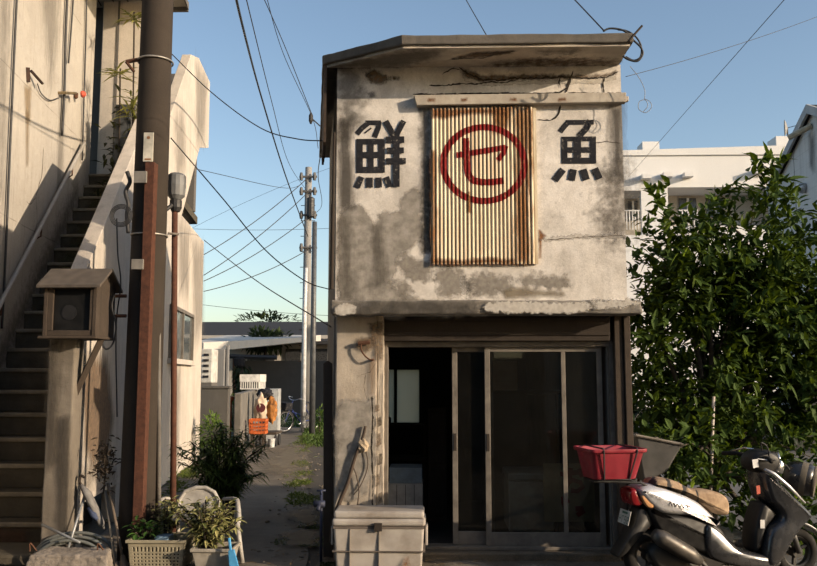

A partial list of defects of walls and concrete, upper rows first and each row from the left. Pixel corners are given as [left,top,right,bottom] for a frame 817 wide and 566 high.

crack [413,67,621,121]
damp [339,120,351,209]
damp [418,108,431,253]
rust [428,98,533,265]
peeling [335,188,640,316]
crack [543,233,626,242]